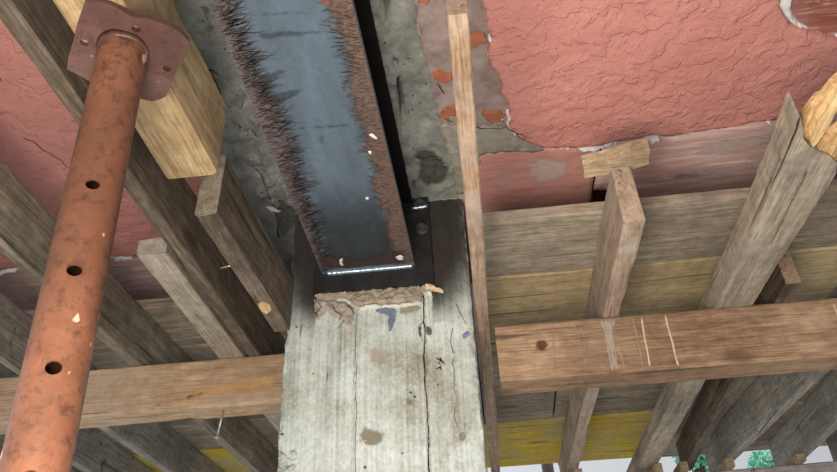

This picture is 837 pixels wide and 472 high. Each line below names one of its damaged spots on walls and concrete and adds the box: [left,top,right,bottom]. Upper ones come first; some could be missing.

corrosion [209,0,414,272]
leakage [417,151,448,185]
flaking render [413,0,464,194]
flaking render [467,0,777,213]
flaking render [779,0,837,37]
spalling [314,284,444,326]
crack [420,293,430,472]